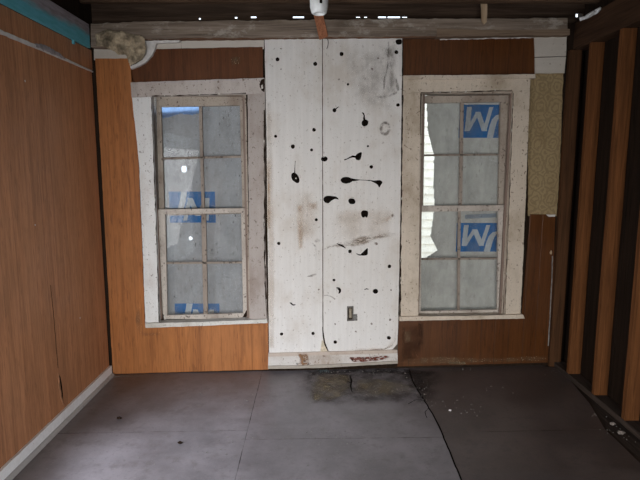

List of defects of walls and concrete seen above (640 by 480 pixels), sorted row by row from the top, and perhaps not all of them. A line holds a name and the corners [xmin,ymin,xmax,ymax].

water stain [312,368,431,400]
crack [408,370,462,480]